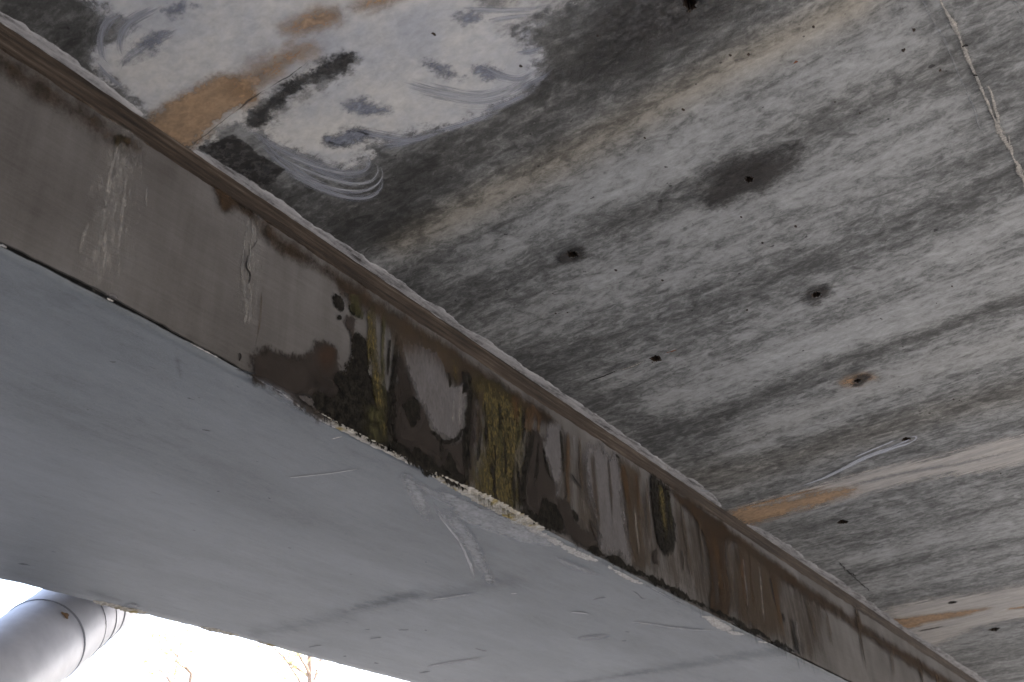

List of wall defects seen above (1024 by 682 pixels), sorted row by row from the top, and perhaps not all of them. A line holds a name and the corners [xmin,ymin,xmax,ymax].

leakage [80,129,138,282]
crack [245,241,257,284]
leakage [242,215,341,425]
leakage [351,295,541,508]
leakage [696,145,804,210]
crack [940,0,1024,183]